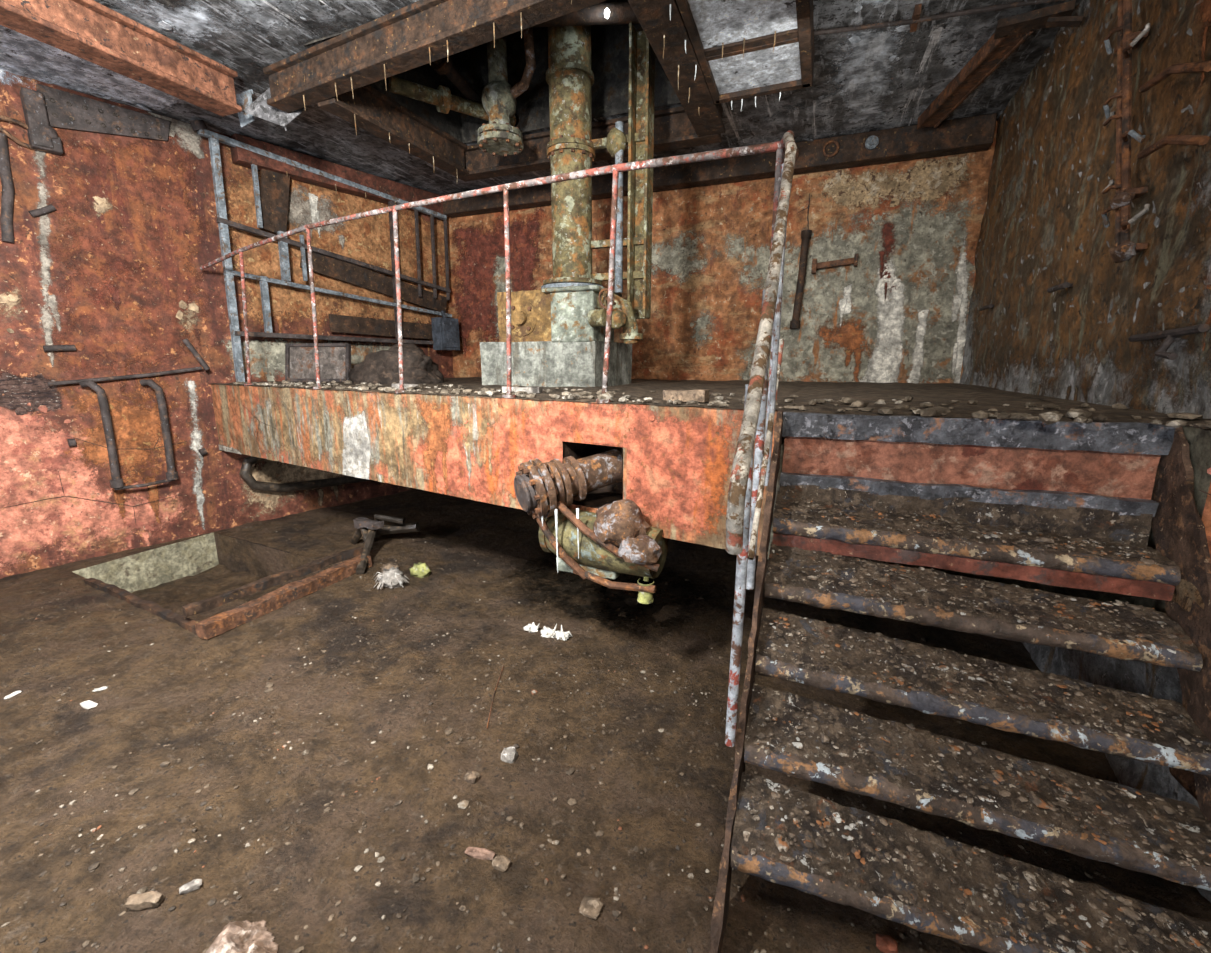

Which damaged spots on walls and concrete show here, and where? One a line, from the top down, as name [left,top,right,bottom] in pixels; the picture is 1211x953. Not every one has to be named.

rust [39,128,210,523]
peeling [651,153,979,384]
damp [859,260,929,384]
damp [951,236,969,383]
rust [414,398,453,493]